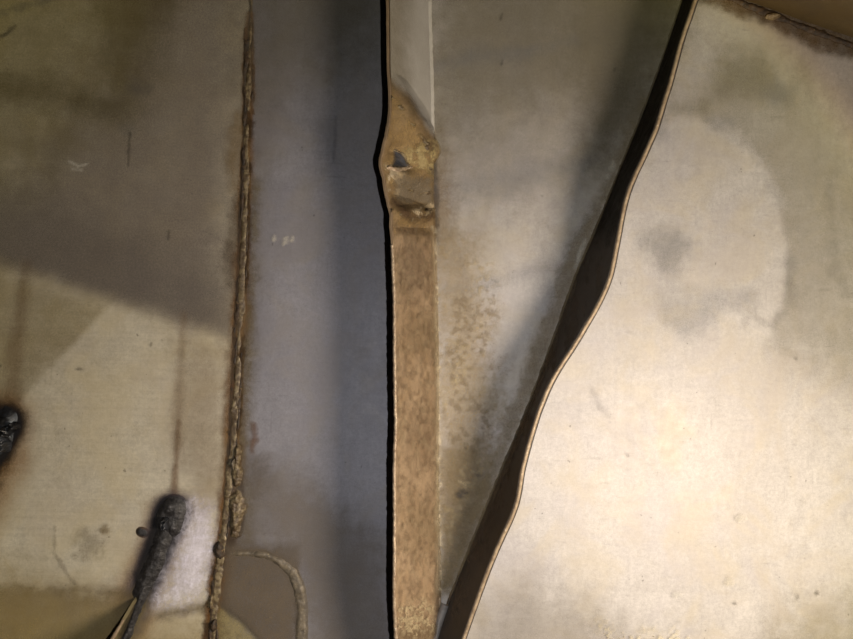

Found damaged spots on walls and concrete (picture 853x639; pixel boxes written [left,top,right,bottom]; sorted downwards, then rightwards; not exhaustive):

corrosion [204,13,258,639]